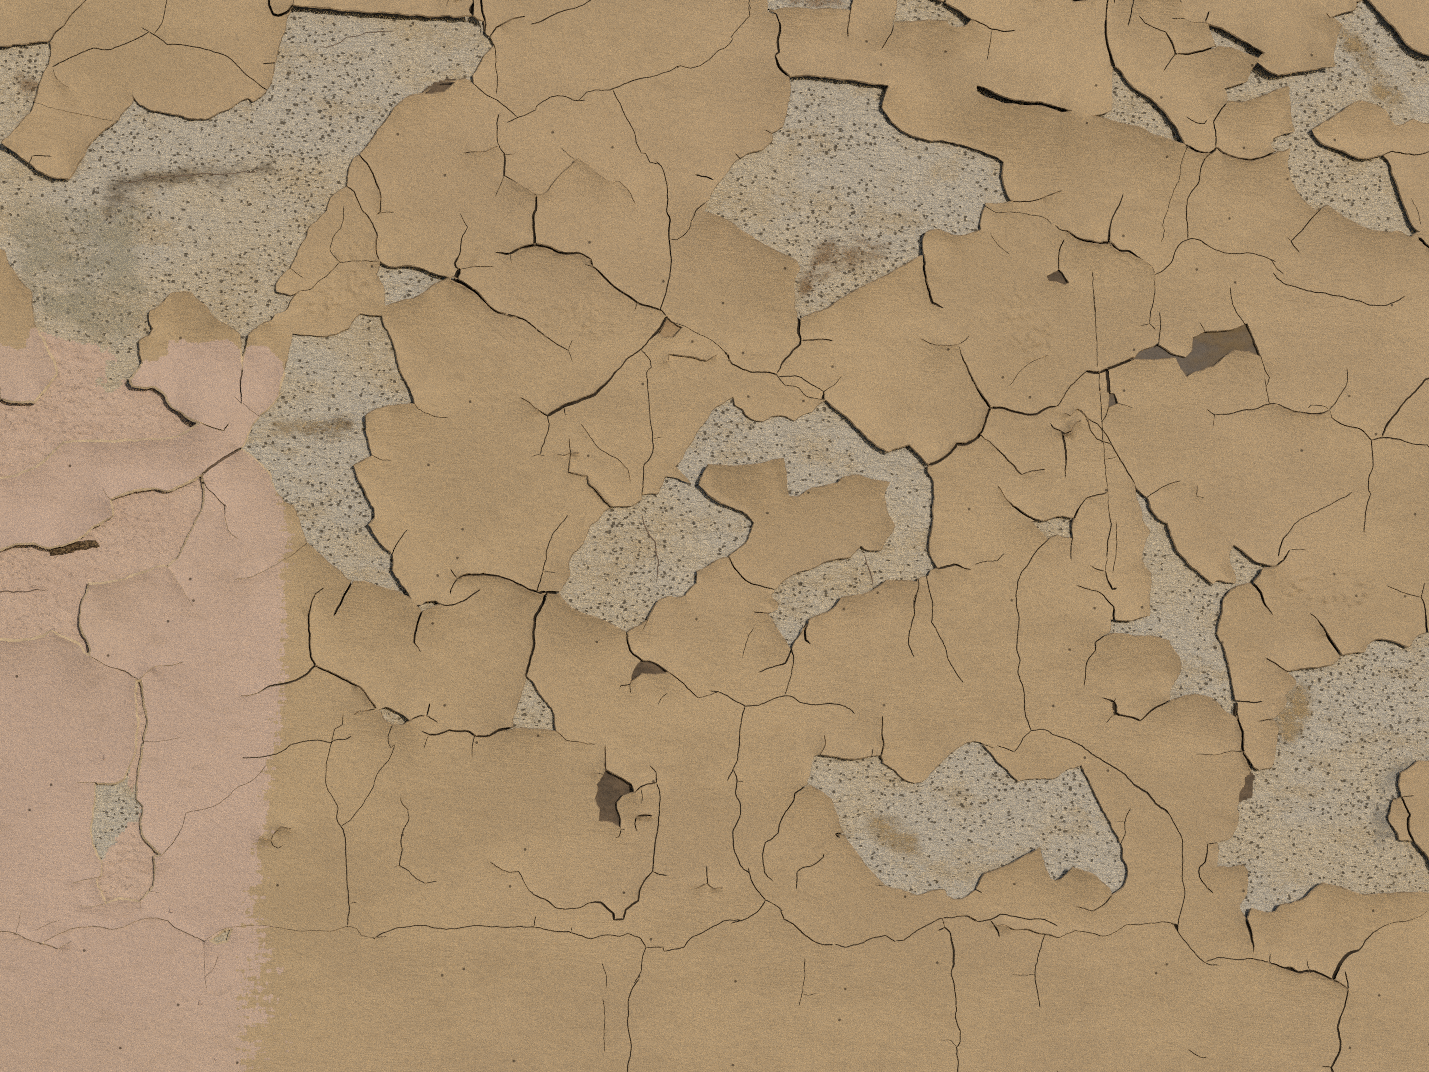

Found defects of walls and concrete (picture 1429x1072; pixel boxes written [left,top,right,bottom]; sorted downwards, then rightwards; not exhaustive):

crack [50,1,272,89]
peeling [0,0,496,684]
crack [268,0,310,17]
crack [447,0,840,578]
peeling [670,0,1211,328]
crack [1073,0,1211,70]
peeling [1176,0,1429,256]
crack [0,587,45,595]
peeling [545,396,947,658]
crack [168,106,1429,1072]
peeling [778,742,1127,910]
peeling [1210,626,1429,929]